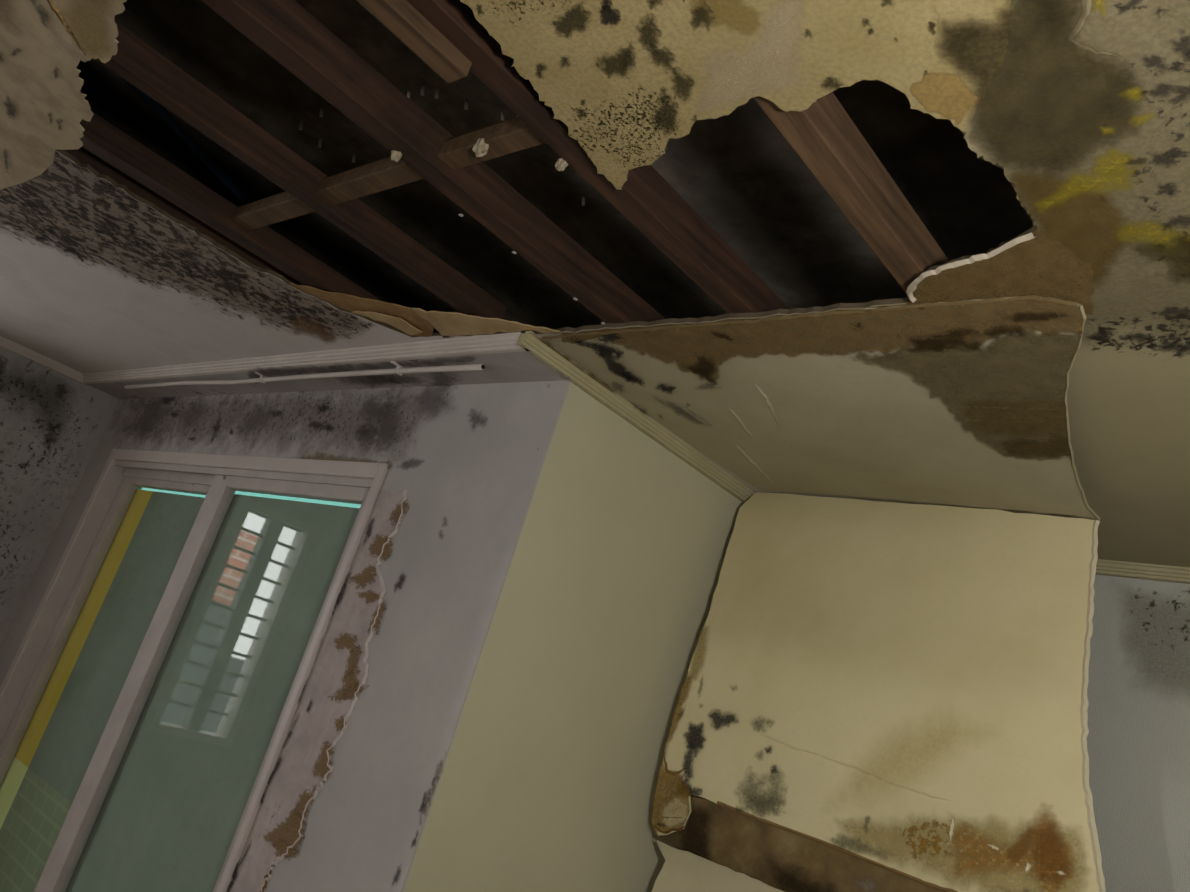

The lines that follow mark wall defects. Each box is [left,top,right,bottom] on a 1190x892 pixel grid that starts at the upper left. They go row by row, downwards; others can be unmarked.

leakage [31,0,86,56]
leakage [0,152,372,341]
leakage [460,0,1190,460]
leakage [124,357,473,468]
leakage [1135,591,1190,649]
peeling [227,489,409,892]
leakage [651,629,737,858]
flaking render [419,761,442,814]
leakage [737,766,780,815]
leakage [836,817,1083,892]
rust [903,813,1072,892]